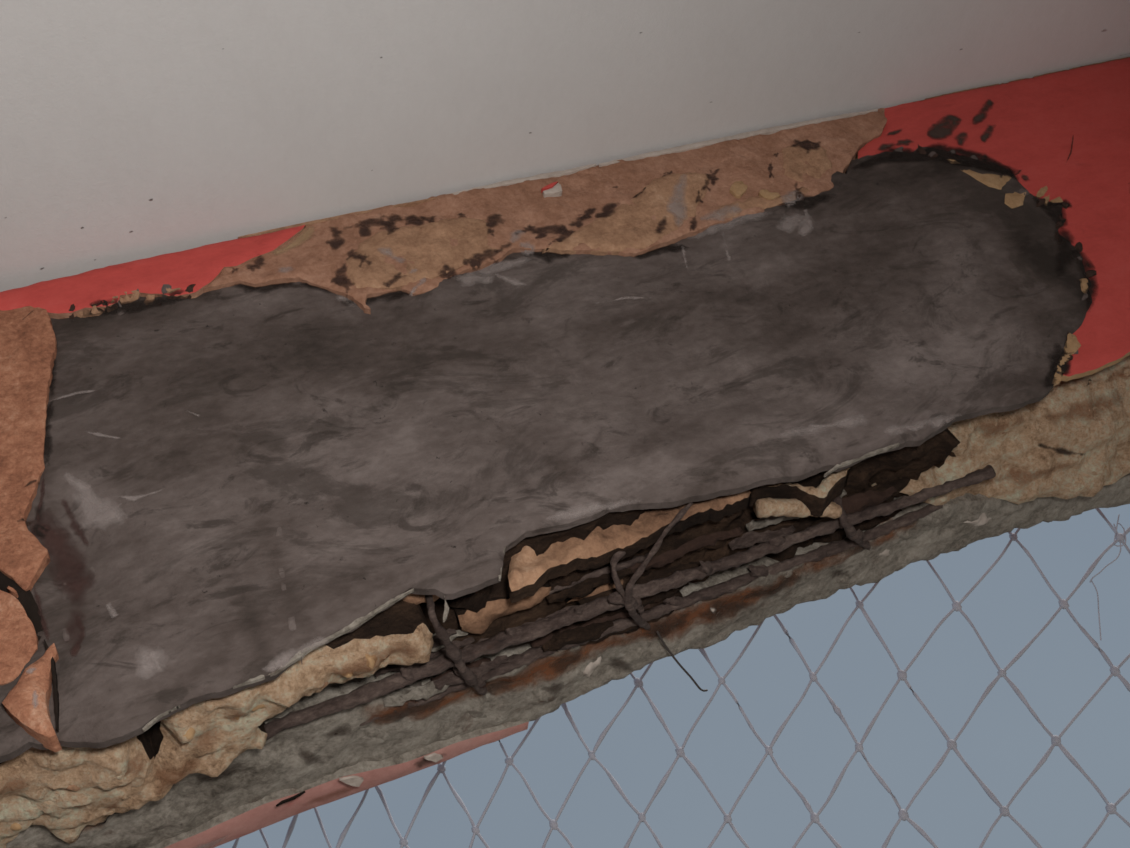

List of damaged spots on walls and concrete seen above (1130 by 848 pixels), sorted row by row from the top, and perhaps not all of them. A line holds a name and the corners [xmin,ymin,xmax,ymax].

peeling [112,108,887,314]
spalling [949,159,1026,208]
crack [0,571,59,732]
spalling [0,305,1130,848]
corrosion [376,571,800,721]